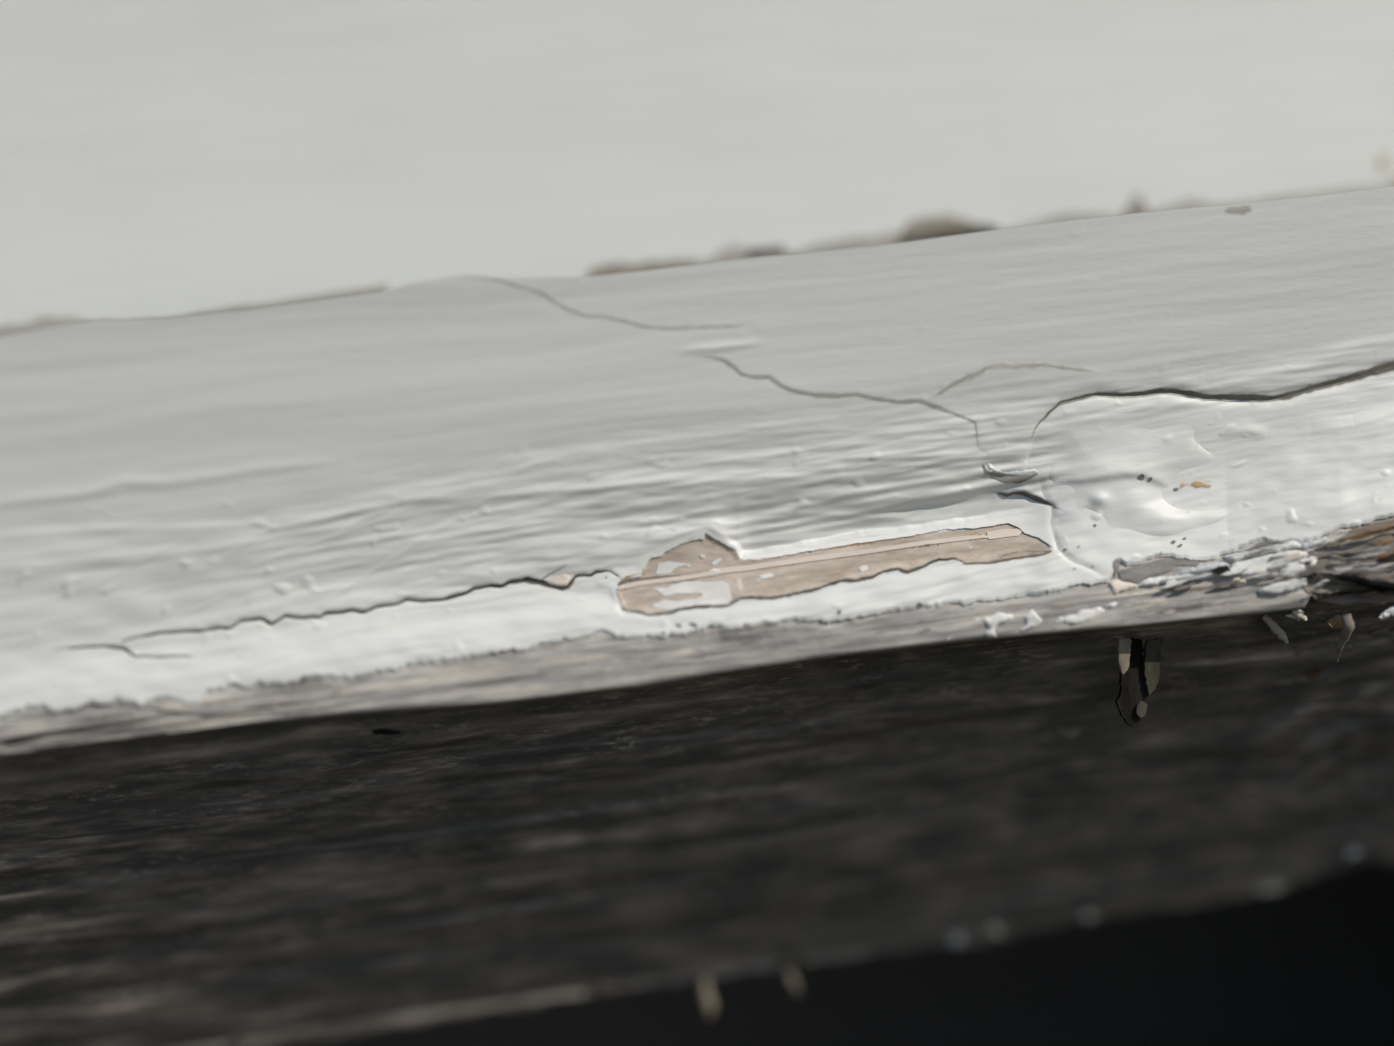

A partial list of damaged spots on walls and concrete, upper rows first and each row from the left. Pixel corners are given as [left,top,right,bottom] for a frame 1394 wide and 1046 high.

crack [719,358,1394,570]
crack [60,566,618,658]
peeling [605,509,1067,627]
peeling [974,602,1118,638]
peeling [1114,537,1200,583]